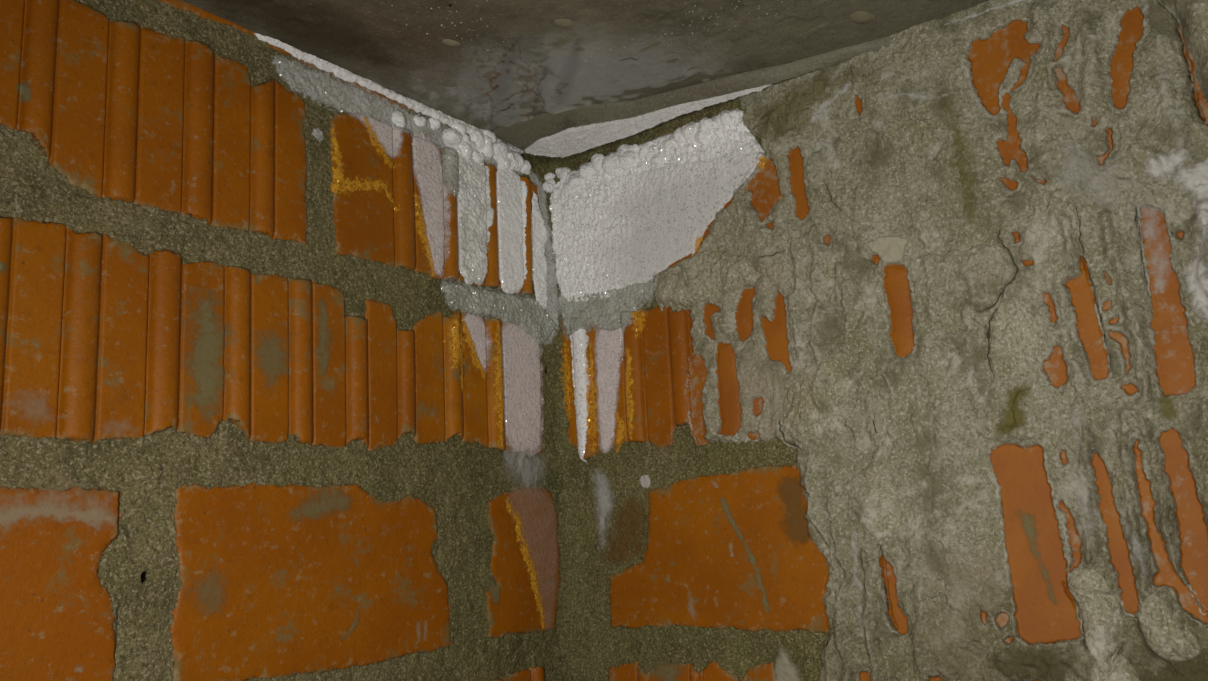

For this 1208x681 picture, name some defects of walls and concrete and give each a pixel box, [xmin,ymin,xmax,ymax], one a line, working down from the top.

spalling [965,17,1114,192]
crack [1178,22,1204,123]
spalling [686,287,792,444]
spalling [743,144,810,229]
spalling [866,252,916,360]
crack [979,224,1018,377]
spalling [1039,254,1139,398]
crack [1076,207,1111,367]
crack [1133,198,1149,296]
leakage [1145,149,1208,320]
spalling [978,442,1084,648]
spalling [1088,428,1208,626]